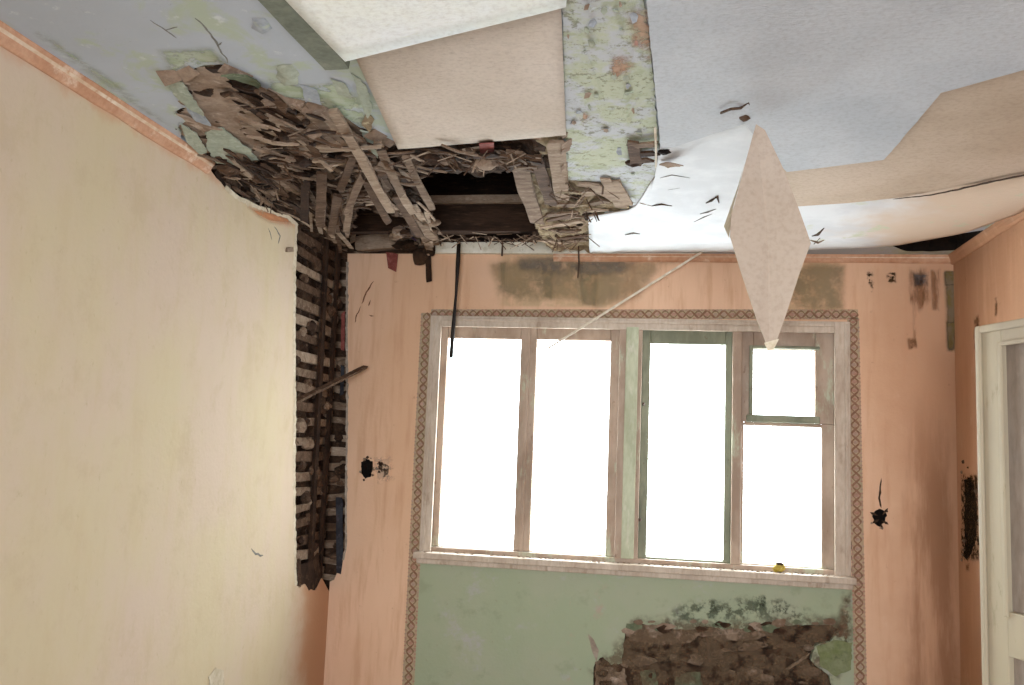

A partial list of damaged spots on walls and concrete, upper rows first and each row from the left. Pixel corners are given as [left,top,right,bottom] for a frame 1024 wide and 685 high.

peeling [164,50,222,132]
peeling [221,73,379,158]
damp [495,259,654,304]
hole [359,456,389,481]
hole [870,508,889,530]
flaking render [588,618,853,685]